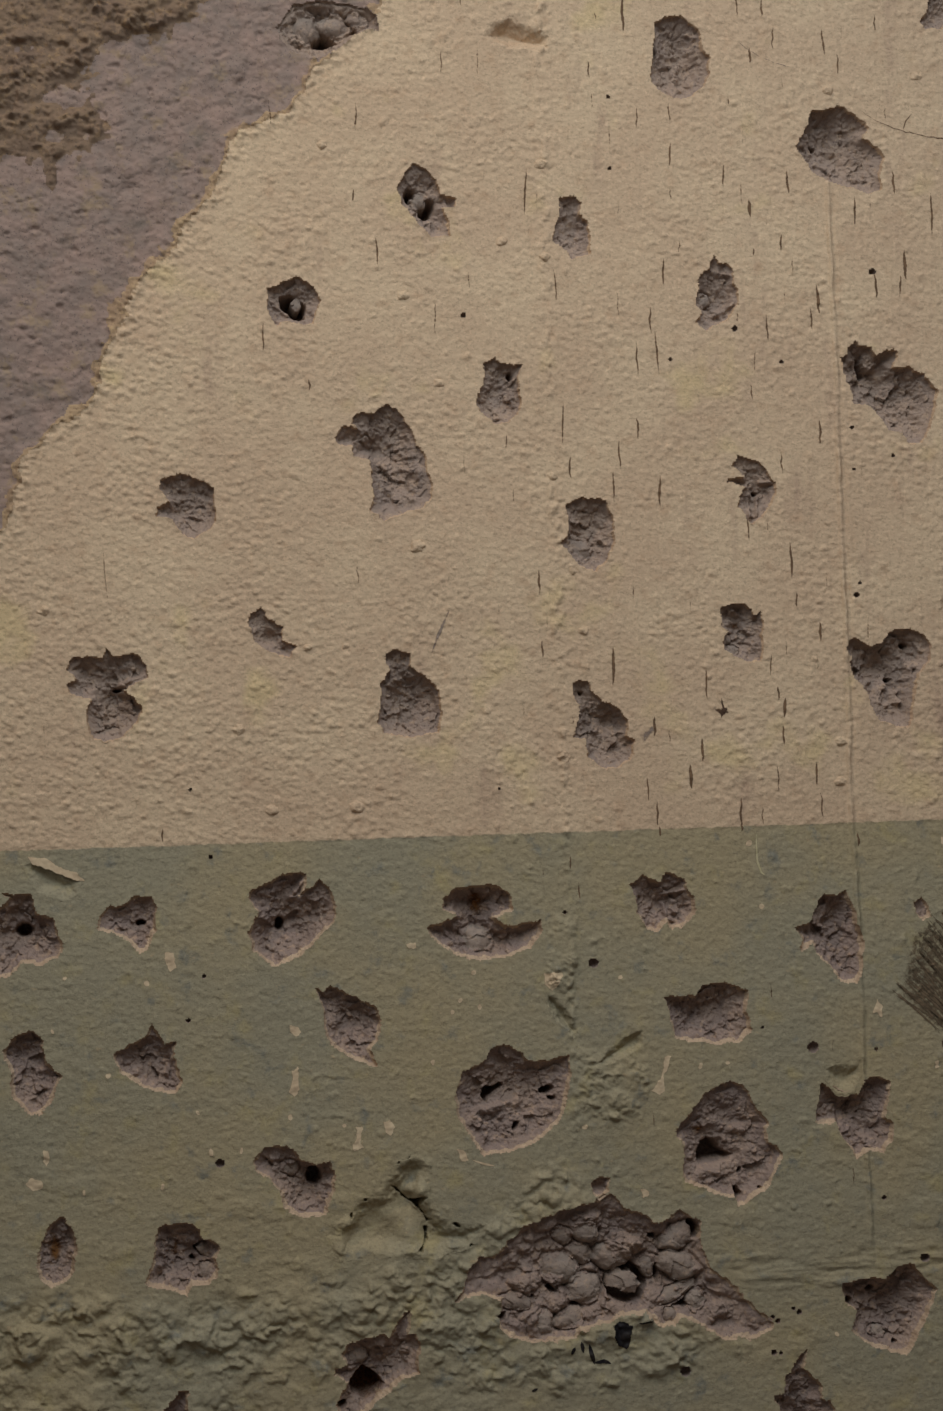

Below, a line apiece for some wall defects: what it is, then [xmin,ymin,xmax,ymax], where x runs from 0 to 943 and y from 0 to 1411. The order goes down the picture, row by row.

spalling [796,105,885,195]
peeling [0,0,382,539]
spalling [840,340,939,444]
spalling [334,404,433,521]
spalling [66,648,148,743]
spalling [846,627,932,728]
spalling [247,871,337,967]
spalling [406,883,543,961]
spalling [455,1044,572,1162]
spalling [675,1080,783,1207]
spalling [601,1260,659,1304]
spalling [842,1263,938,1356]